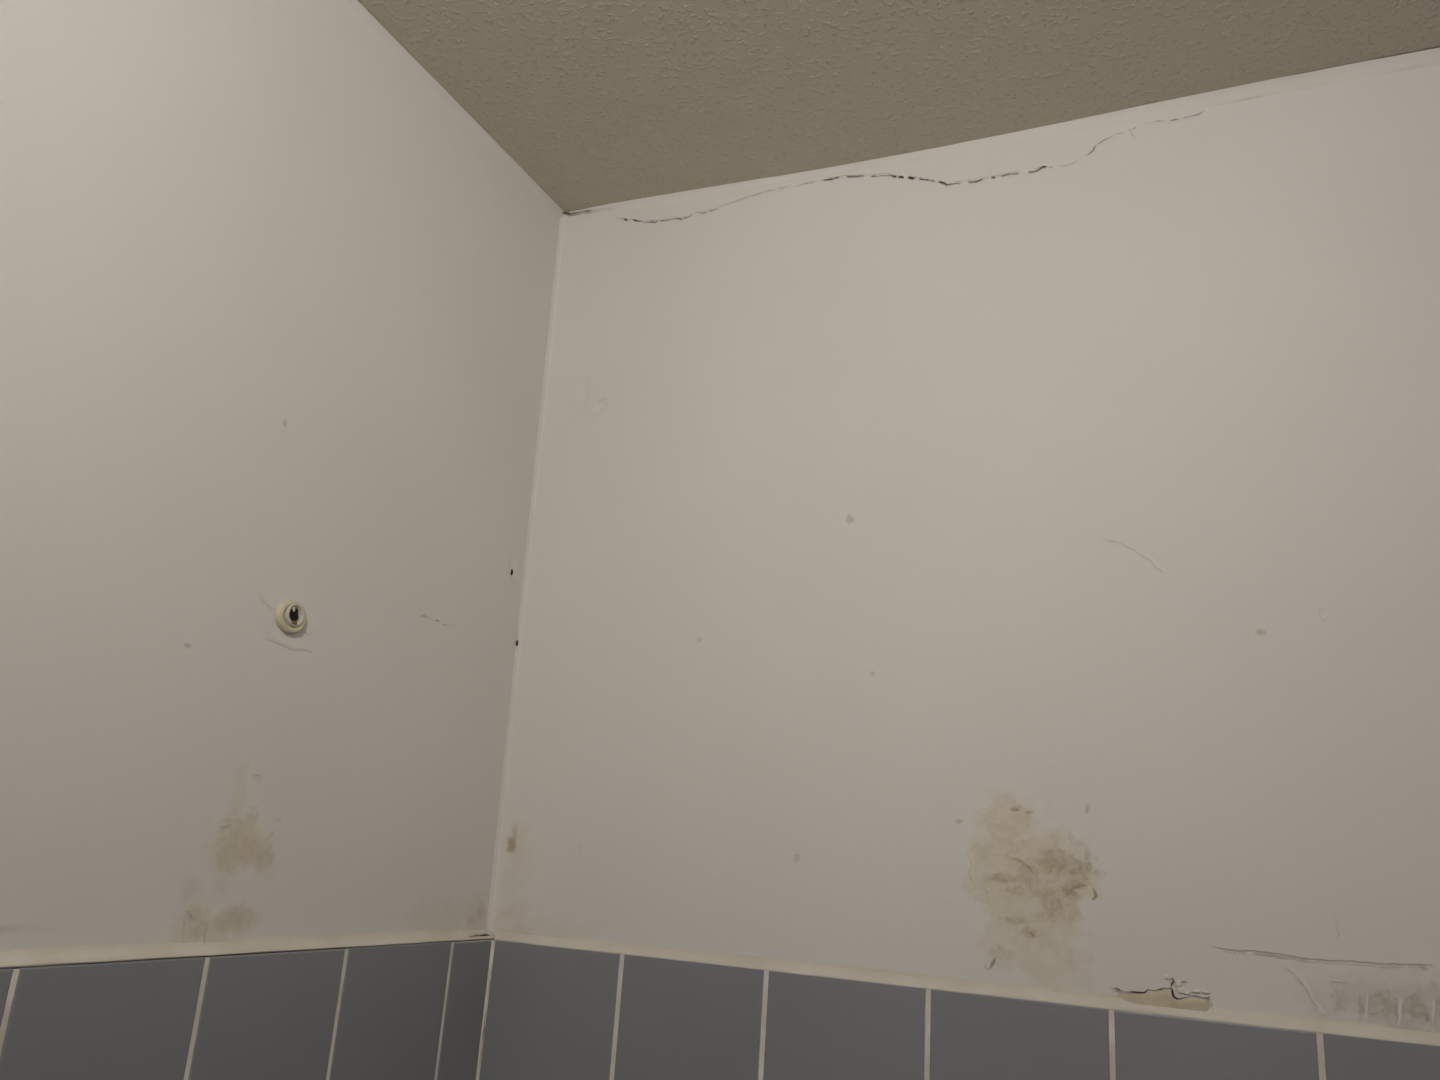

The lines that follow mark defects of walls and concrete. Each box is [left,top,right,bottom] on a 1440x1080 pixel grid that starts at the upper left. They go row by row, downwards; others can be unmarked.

crack [563,165,1049,223]